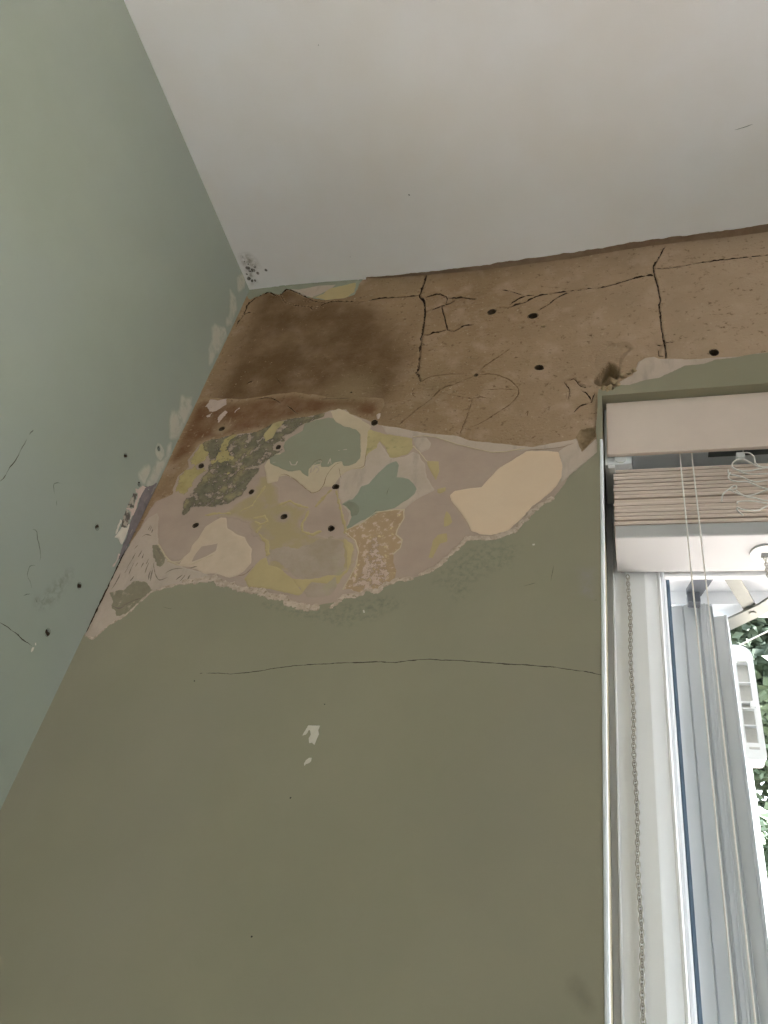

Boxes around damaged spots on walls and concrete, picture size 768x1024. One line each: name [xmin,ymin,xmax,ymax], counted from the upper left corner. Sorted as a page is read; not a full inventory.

crack [504,248,767,358]
leakage [129,250,431,544]
peeling [85,224,768,640]
crack [564,379,595,412]
crack [200,659,601,675]
peeling [303,725,320,745]